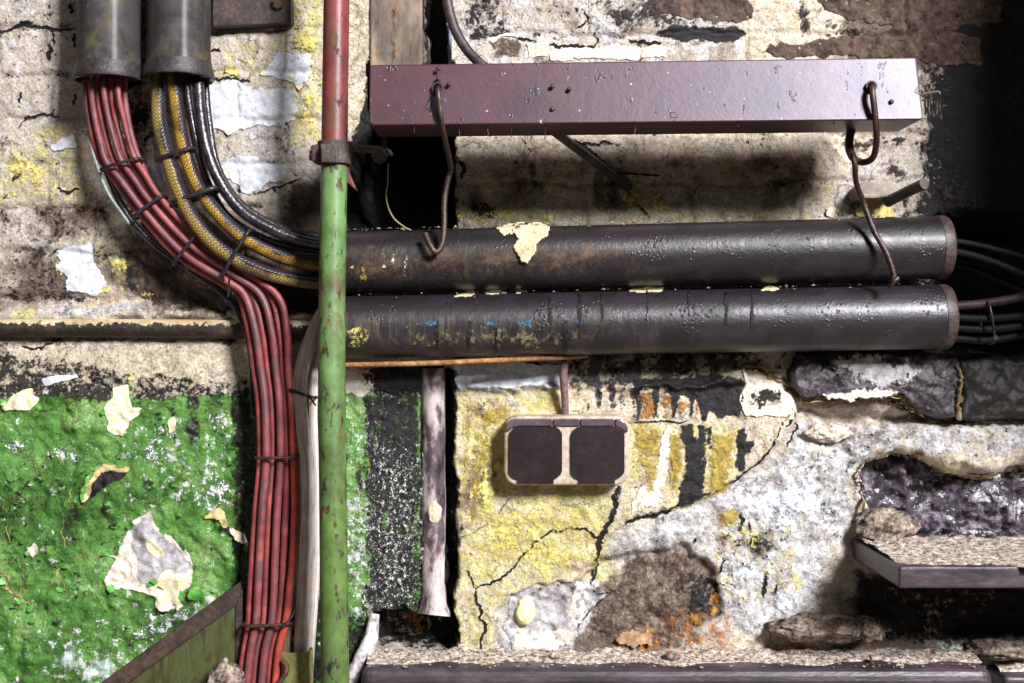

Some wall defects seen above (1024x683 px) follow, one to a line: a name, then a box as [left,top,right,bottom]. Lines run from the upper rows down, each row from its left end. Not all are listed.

spalling [763,0,1004,66]
peeling [210,51,314,135]
peeling [56,241,107,297]
water stain [0,342,238,481]
peeling [101,511,217,612]
water stain [192,458,235,508]
crack [460,485,678,650]
crack [629,418,687,426]
crack [739,513,752,531]
crack [701,412,799,497]
flaking render [740,349,1024,442]
corrosion [646,593,722,648]